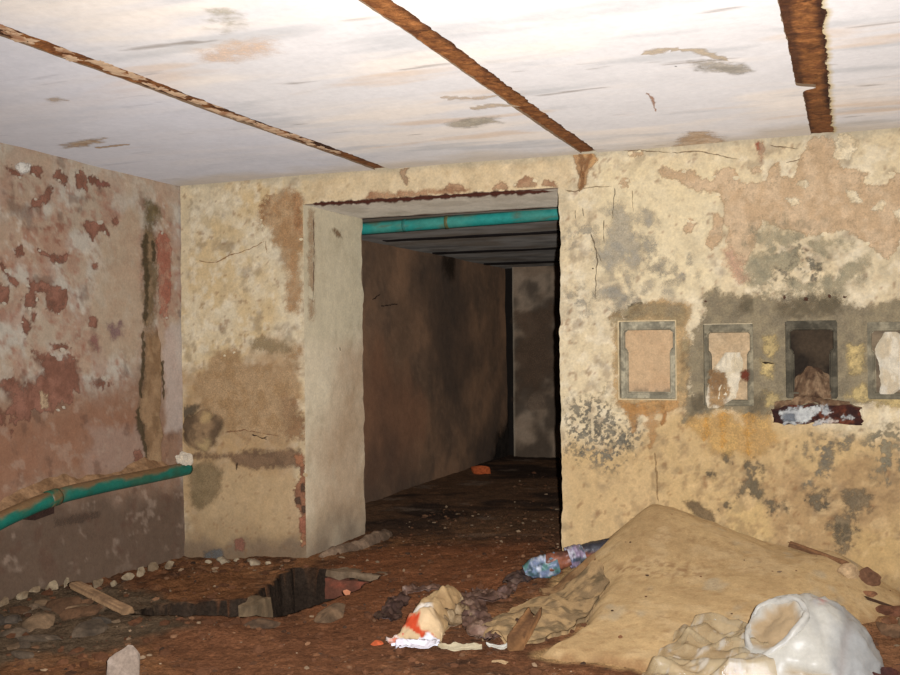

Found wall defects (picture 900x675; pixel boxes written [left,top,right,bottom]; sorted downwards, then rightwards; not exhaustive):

rust [0,26,384,168]
rust [362,0,598,192]
rust [779,0,834,134]
rust [313,187,553,206]
crack [567,186,634,299]
crack [624,150,733,159]
peeling [659,133,900,265]
peeling [0,263,68,334]
peeling [0,343,80,434]
leakage [566,400,641,468]
leakage [738,461,788,513]
leakage [803,423,900,511]